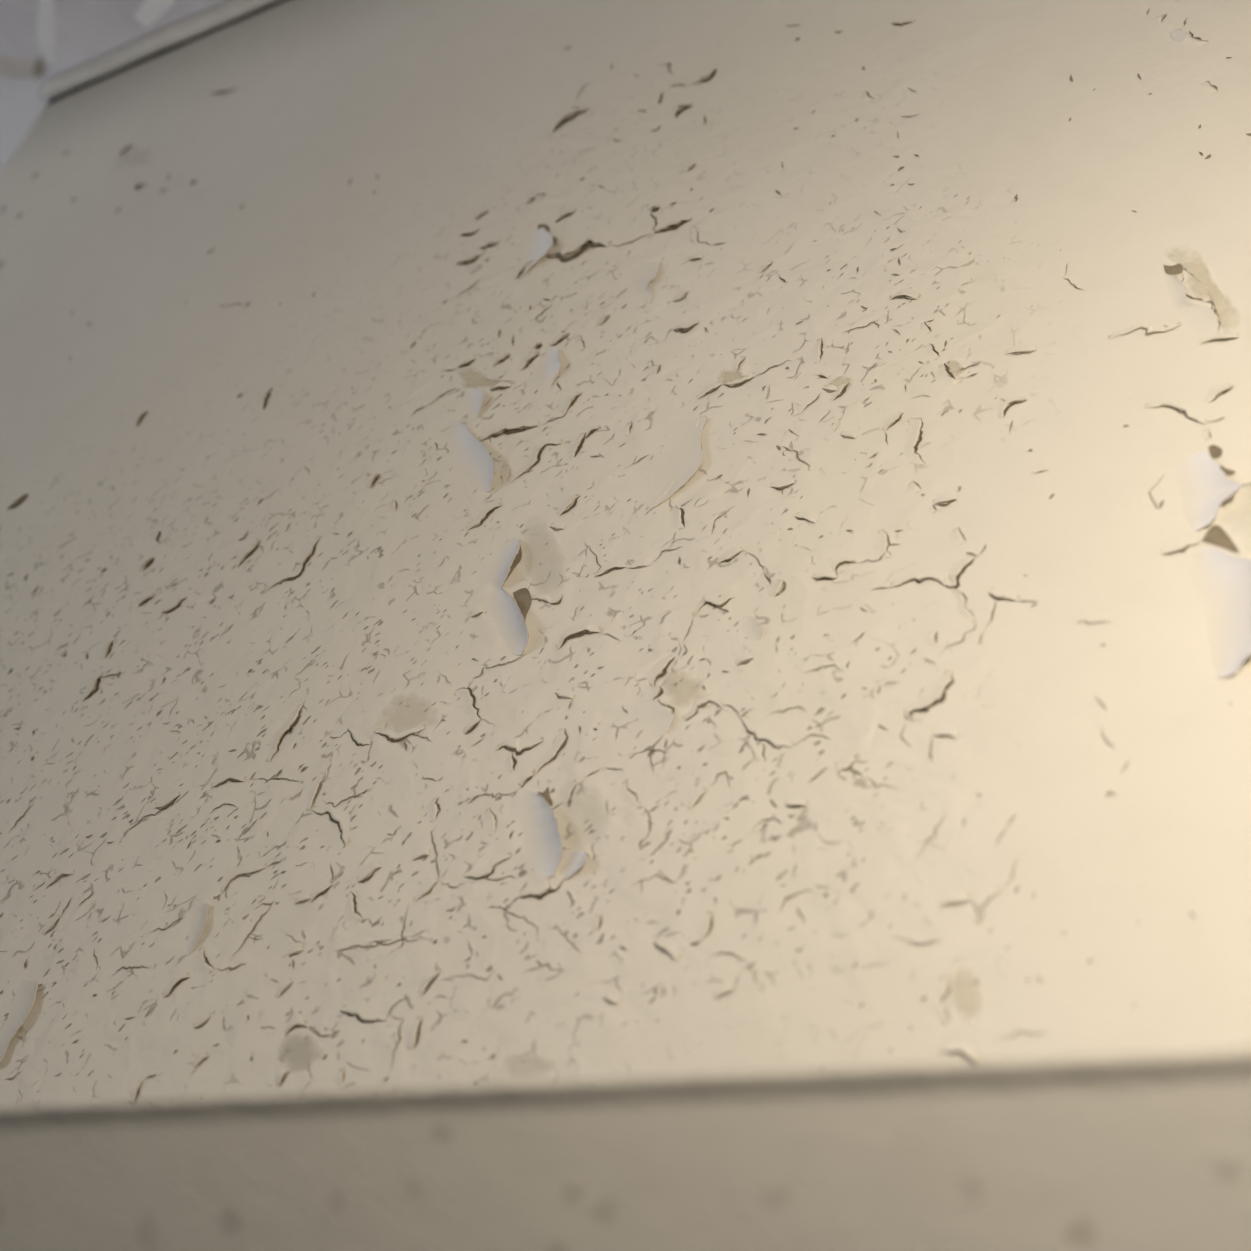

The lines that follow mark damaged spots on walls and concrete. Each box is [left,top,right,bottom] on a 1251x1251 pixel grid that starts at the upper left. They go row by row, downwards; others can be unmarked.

peeling [519,227,590,279]
peeling [447,372,507,492]
crack [410,304,610,417]
crack [465,382,648,531]
crack [696,288,1037,524]
peeling [1174,452,1242,531]
peeling [488,537,529,656]
crack [531,591,621,650]
crack [568,411,1035,842]
peeling [1190,547,1251,679]
crack [93,655,602,1073]
peeling [517,789,564,878]